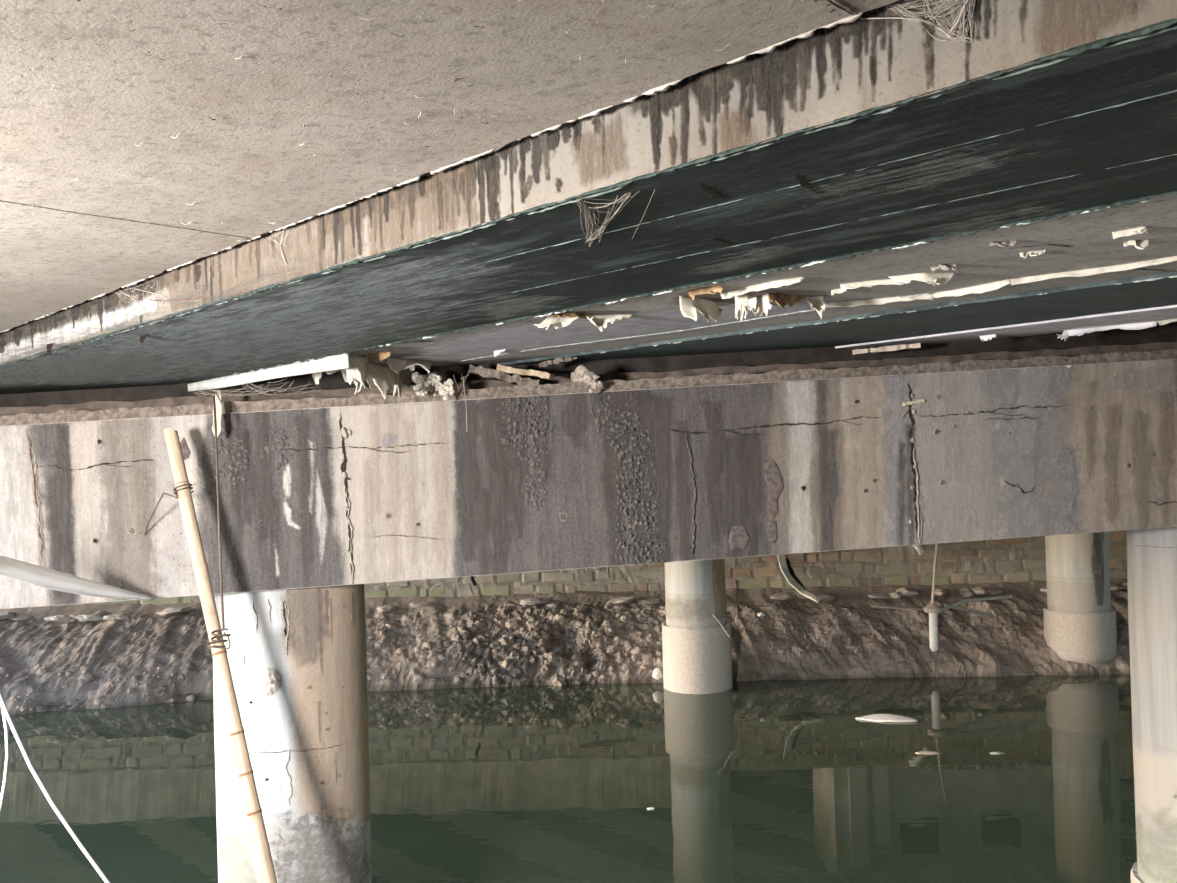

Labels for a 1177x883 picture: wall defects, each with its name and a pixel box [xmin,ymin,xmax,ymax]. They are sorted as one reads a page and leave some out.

leakage [0,418,157,608]
crack [280,413,448,583]
peeling [311,352,431,399]
peeling [534,312,633,332]
crack [667,379,1065,544]
peeling [679,226,1177,322]
leakage [883,367,1082,546]